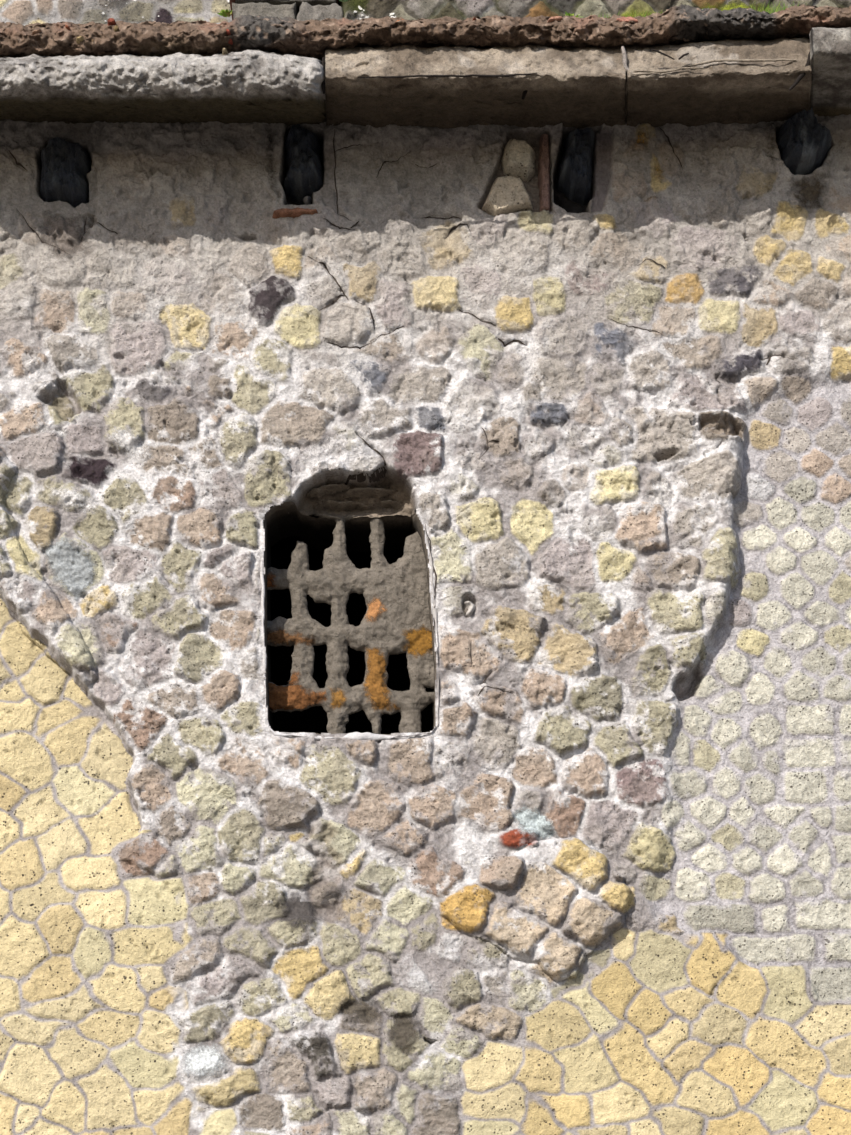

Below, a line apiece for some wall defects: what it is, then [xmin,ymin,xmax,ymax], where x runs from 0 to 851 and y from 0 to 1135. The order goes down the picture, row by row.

crack [323,129,436,230]
crack [424,216,471,239]
crack [308,256,404,349]
crack [459,309,525,346]
spalling [33,375,83,423]
spalling [652,446,679,462]
spalling [281,466,419,518]
spalling [461,591,478,619]
spalling [671,648,704,703]
spalling [299,819,347,928]